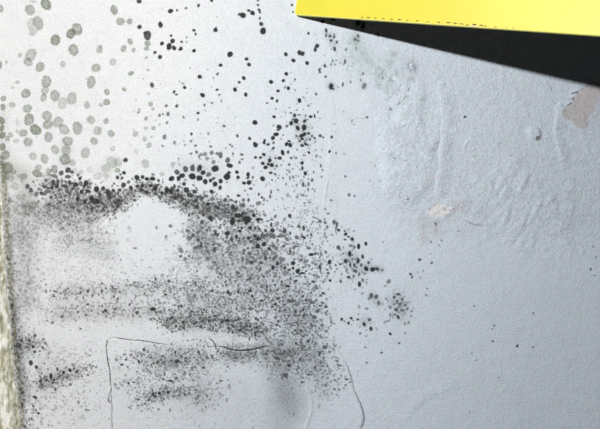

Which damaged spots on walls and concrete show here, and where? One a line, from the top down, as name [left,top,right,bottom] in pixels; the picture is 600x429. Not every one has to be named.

water stain [238,0,266,34]
spalling [556,75,600,136]
water stain [26,98,379,356]
water stain [0,117,46,427]
water stain [29,360,94,391]